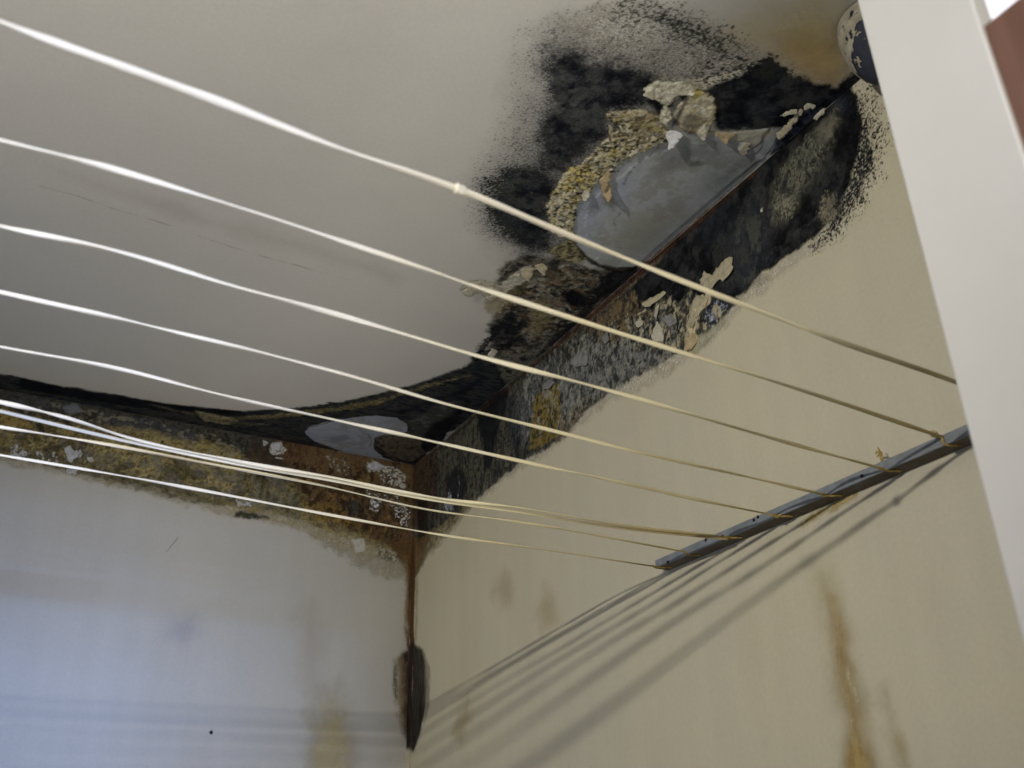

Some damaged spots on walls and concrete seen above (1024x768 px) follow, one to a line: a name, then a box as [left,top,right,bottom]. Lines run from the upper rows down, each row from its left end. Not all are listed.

peeling [305,415,408,462]
water stain [0,18,890,579]
corrosion [431,172,756,456]
peeling [412,0,827,574]
corrosion [392,536,430,751]